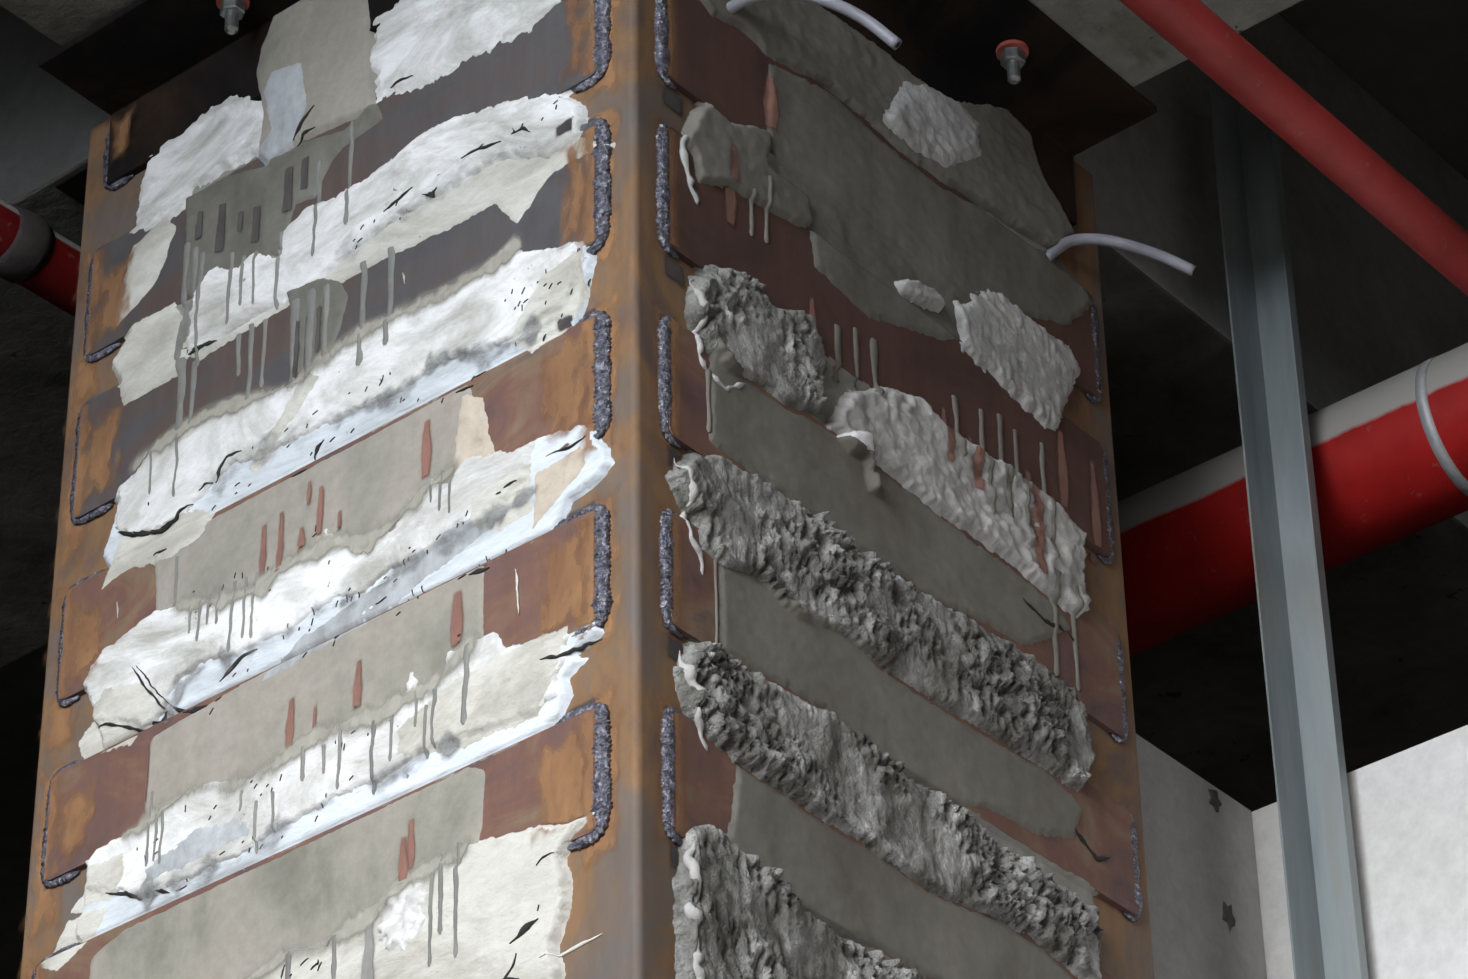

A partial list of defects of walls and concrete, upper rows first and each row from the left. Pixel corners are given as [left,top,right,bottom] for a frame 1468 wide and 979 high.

corrosion [62,252,132,557]
leakage [172,0,395,497]
leakage [89,566,485,979]
crack [98,480,517,732]
peeling [41,622,604,979]
leakage [155,386,495,652]
peeling [79,425,615,759]
peeling [102,90,616,589]
crack [503,904,539,979]
crack [540,638,603,660]
corrosion [538,689,619,865]
corrosion [556,109,620,261]